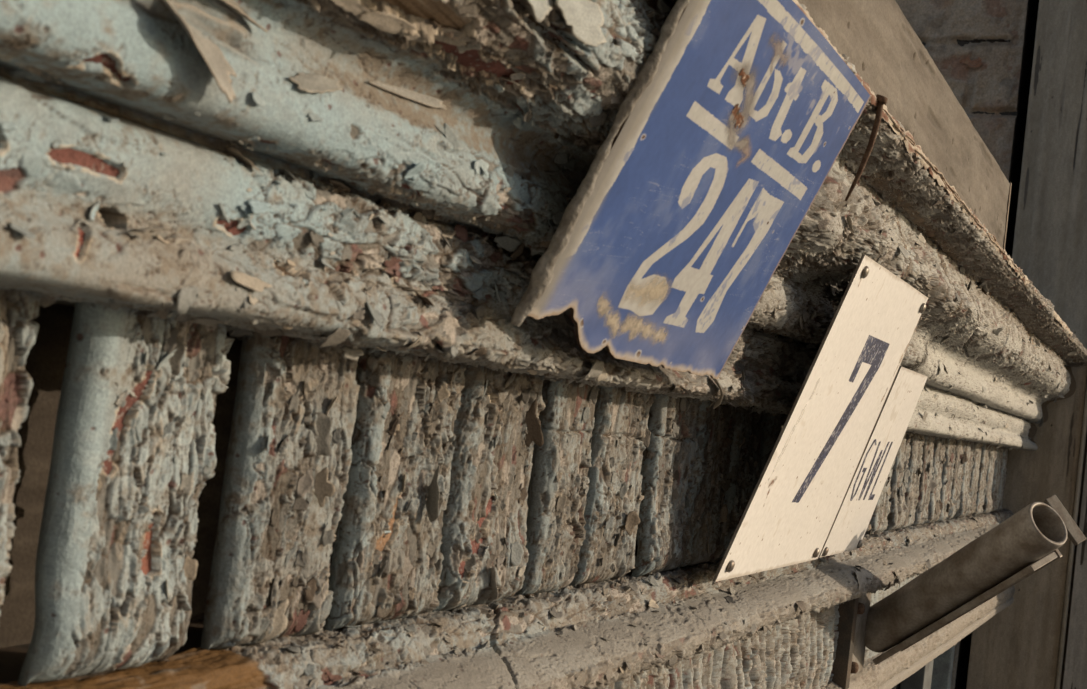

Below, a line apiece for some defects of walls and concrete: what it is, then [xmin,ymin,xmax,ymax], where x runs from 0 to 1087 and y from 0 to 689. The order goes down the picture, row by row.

peeling [67,53,131,82]
peeling [162,0,237,103]
peeling [367,81,447,109]
peeling [332,0,526,93]
peeling [512,0,618,47]
peeling [48,140,129,178]
peeling [75,201,101,258]
peeling [216,159,350,253]
peeling [816,198,899,242]
peeling [880,225,955,264]
peeling [817,266,1085,591]
peeling [97,253,791,689]